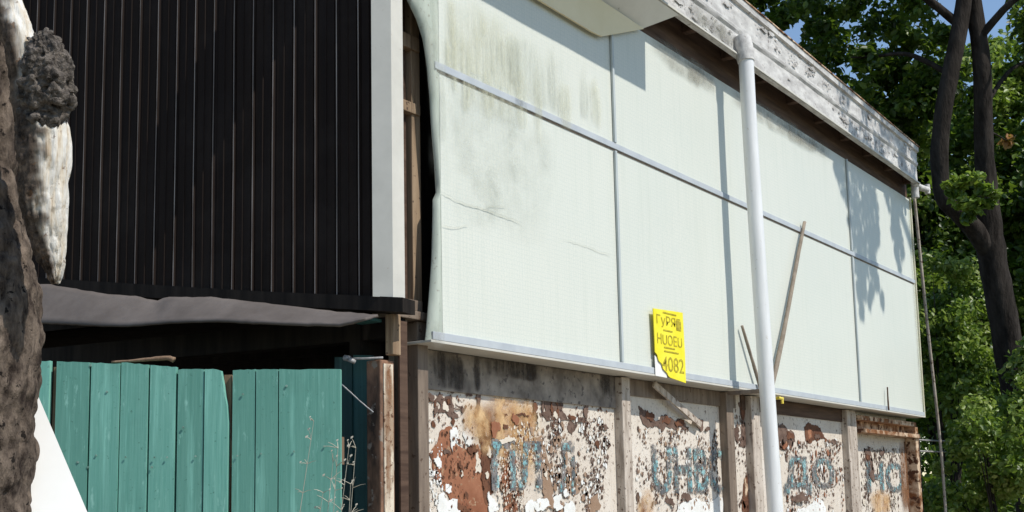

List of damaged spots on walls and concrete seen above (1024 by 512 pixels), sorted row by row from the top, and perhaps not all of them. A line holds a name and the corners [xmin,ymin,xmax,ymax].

peeling [428,392,613,512]
peeling [636,406,723,512]
peeling [778,422,844,512]
peeling [861,446,905,512]